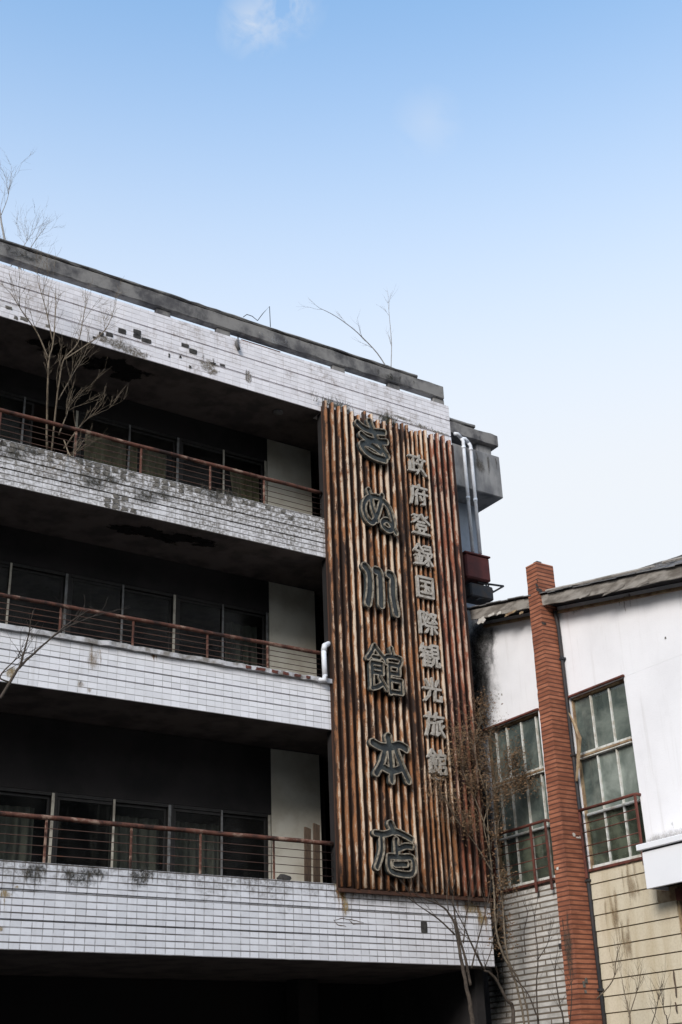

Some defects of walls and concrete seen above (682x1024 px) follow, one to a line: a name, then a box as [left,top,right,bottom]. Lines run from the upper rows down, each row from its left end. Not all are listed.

peeling [27,324,154,382]
mould [80,469,119,488]
mould [471,629,493,752]
mould [65,869,103,884]